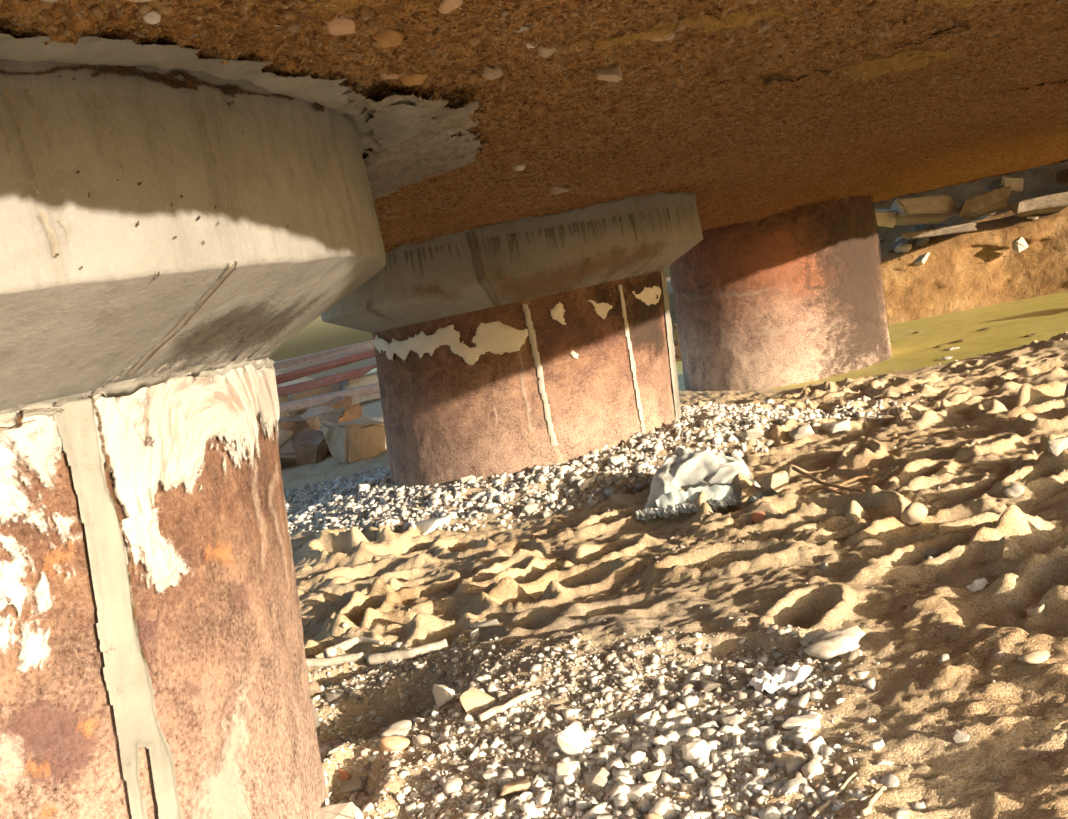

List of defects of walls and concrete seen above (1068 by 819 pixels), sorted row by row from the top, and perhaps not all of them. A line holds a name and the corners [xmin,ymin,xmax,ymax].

spalling [339,92,487,199]
leakage [165,292,327,366]
flaking render [374,321,528,365]
flaking render [550,302,567,325]
flaking render [588,300,613,319]
flaking render [632,285,661,306]
flaking render [0,404,82,549]
flaking render [79,347,280,592]
flaking render [0,535,75,672]